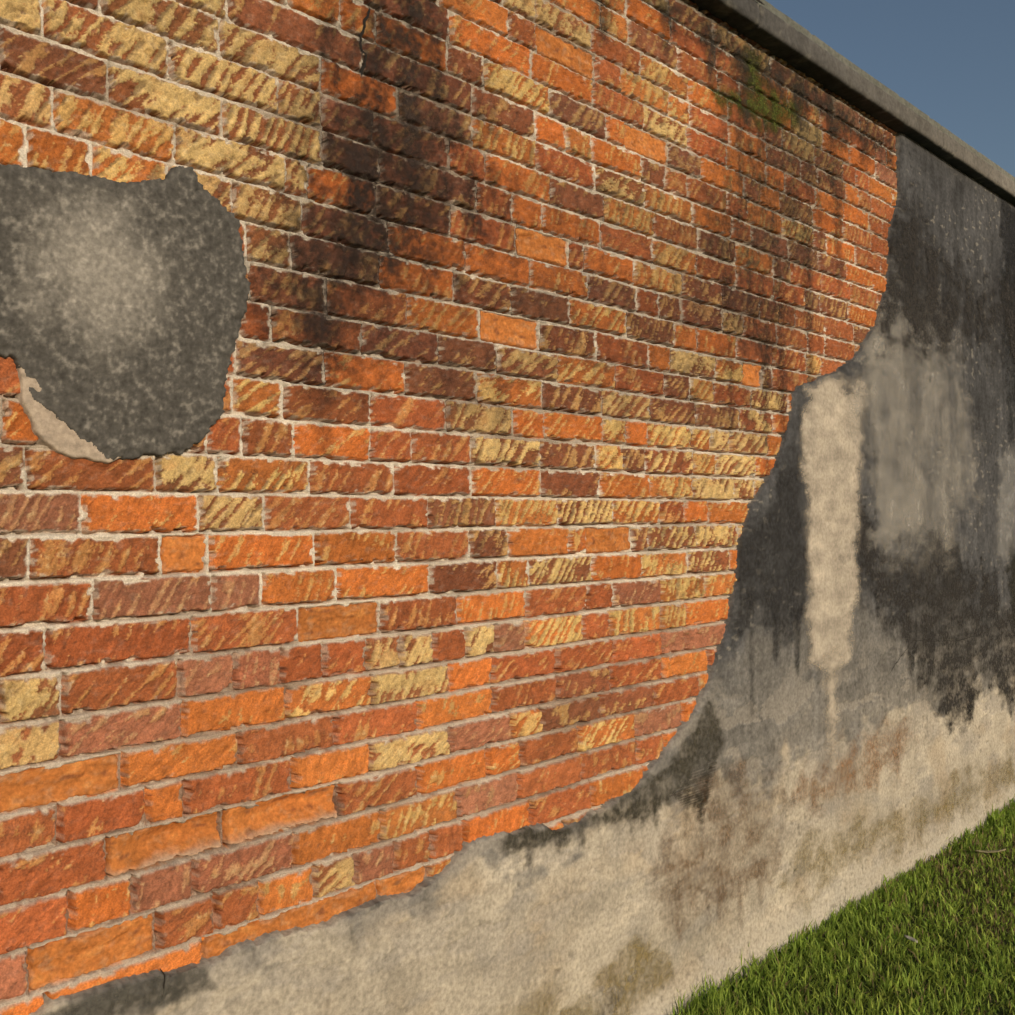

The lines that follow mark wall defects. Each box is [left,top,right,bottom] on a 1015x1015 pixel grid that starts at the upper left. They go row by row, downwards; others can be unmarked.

spalling [624,125,667,164]
leakage [700,15,894,311]
leakage [880,197,1015,439]
peeling [15,368,121,464]
spalling [160,535,206,574]
peeling [201,133,1015,959]
leakage [734,379,1015,769]
spalling [0,754,118,813]
spalling [105,784,337,876]
spalling [26,914,197,1015]